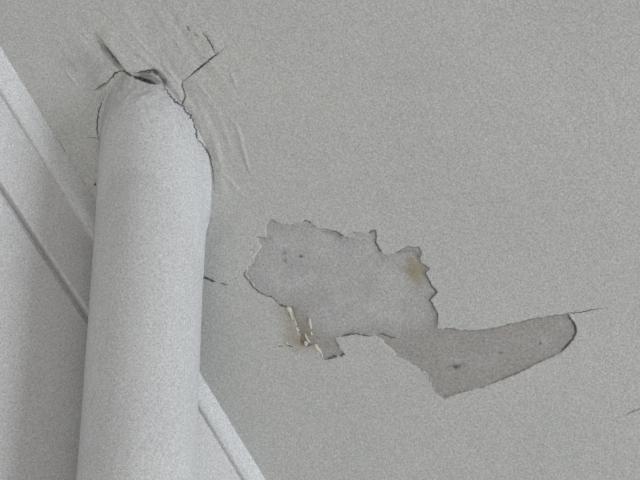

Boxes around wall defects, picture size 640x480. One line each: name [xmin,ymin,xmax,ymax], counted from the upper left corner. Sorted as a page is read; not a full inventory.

crack [96,46,131,148]
crack [164,26,218,187]
peeling [244,220,577,399]